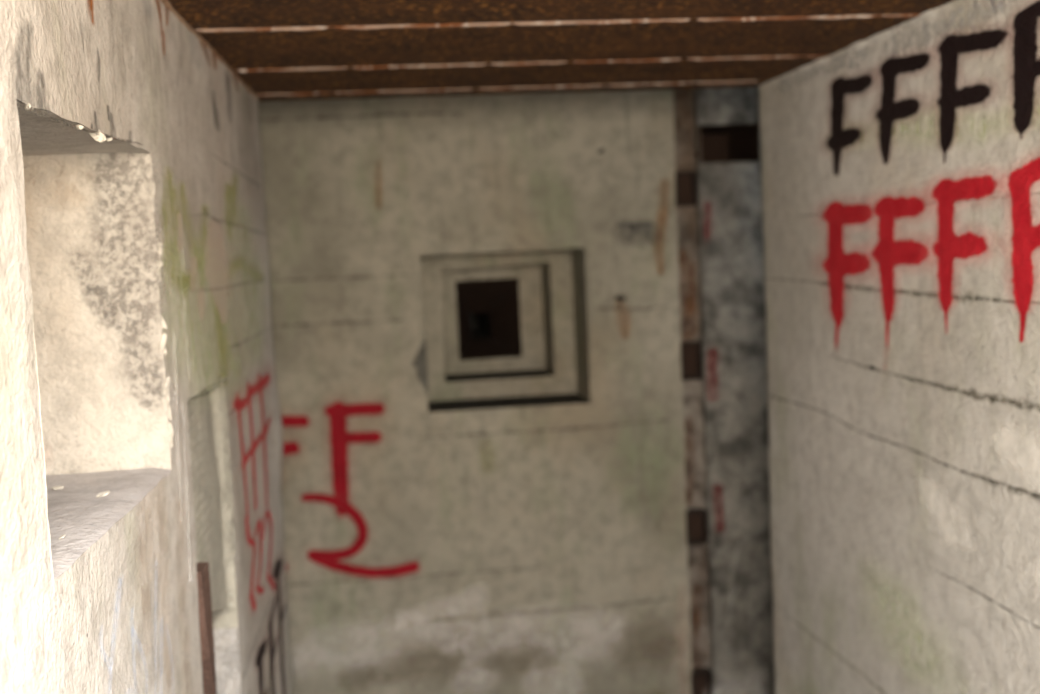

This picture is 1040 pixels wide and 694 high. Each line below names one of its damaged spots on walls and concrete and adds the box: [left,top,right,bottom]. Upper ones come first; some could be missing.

damp [76,139,206,406]
spalling [202,627,241,694]